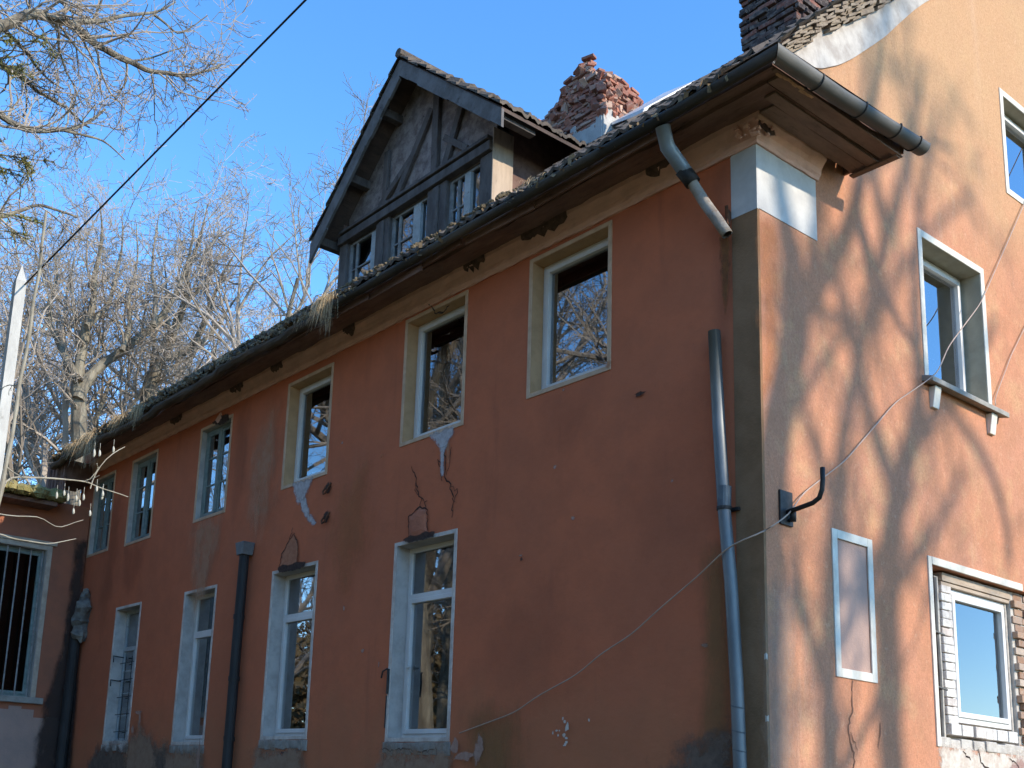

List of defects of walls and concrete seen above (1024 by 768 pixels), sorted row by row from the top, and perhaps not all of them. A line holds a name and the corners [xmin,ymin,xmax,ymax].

crack [411,447,458,515]
leakage [35,542,87,768]
crack [848,680,881,768]